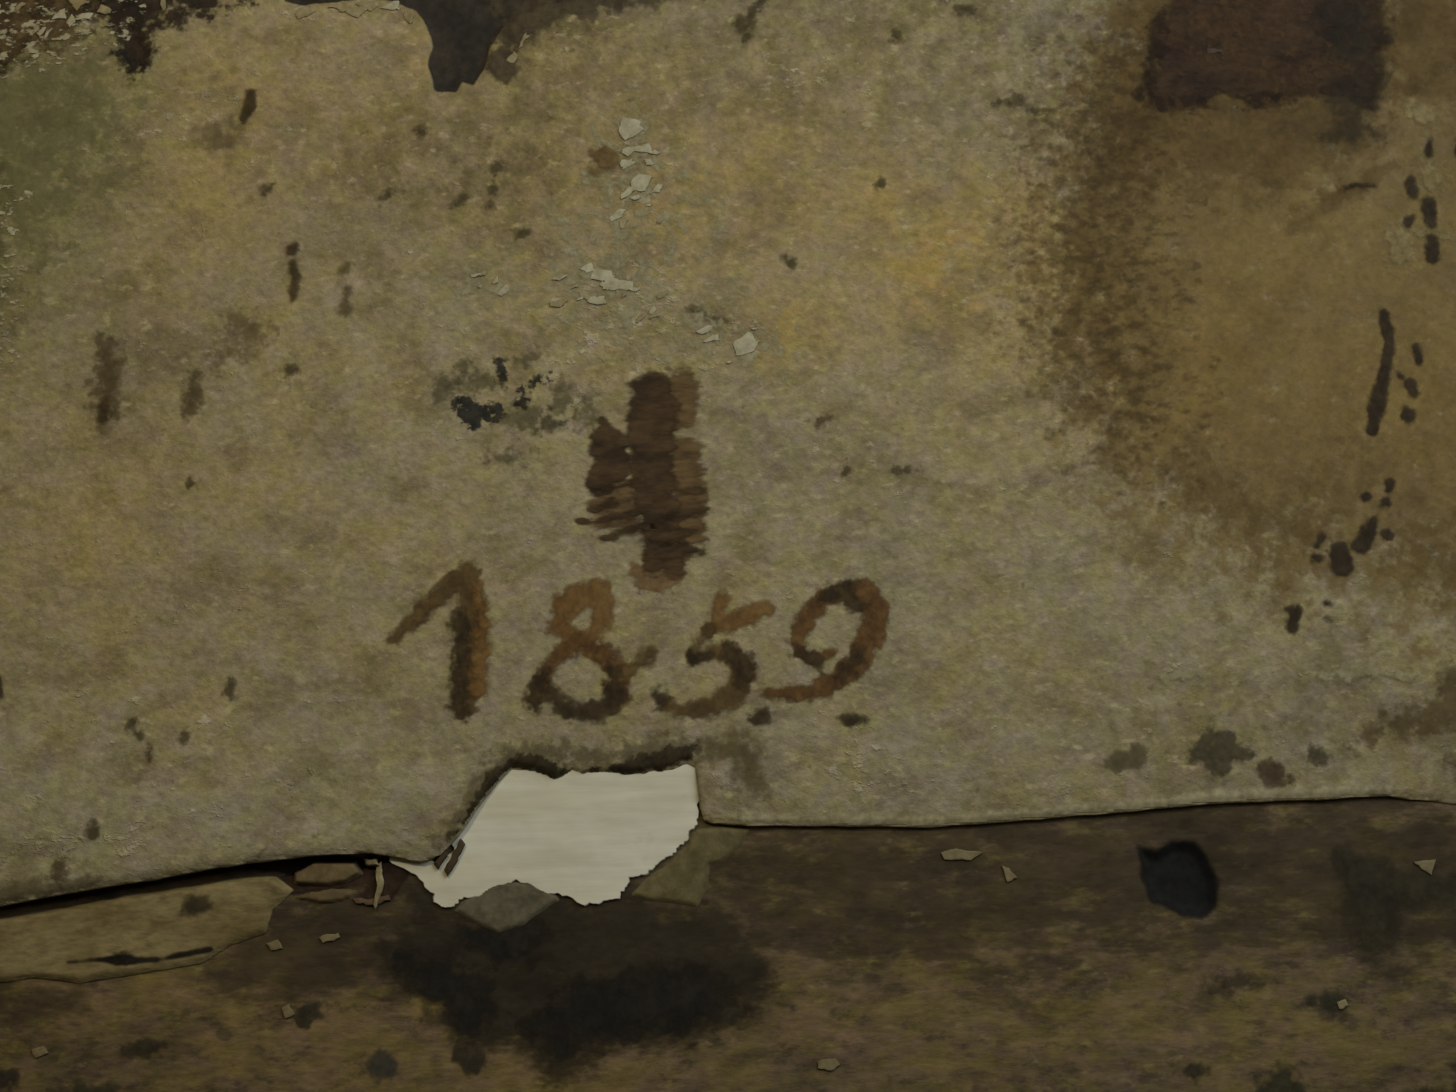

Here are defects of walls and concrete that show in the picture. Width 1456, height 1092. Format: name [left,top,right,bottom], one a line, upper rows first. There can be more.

peeling [0,0,255,79]
peeling [0,185,33,235]
damp [1045,0,1456,632]
crack [0,855,363,910]
spalling [0,740,1394,984]
damp [452,1043,486,1073]